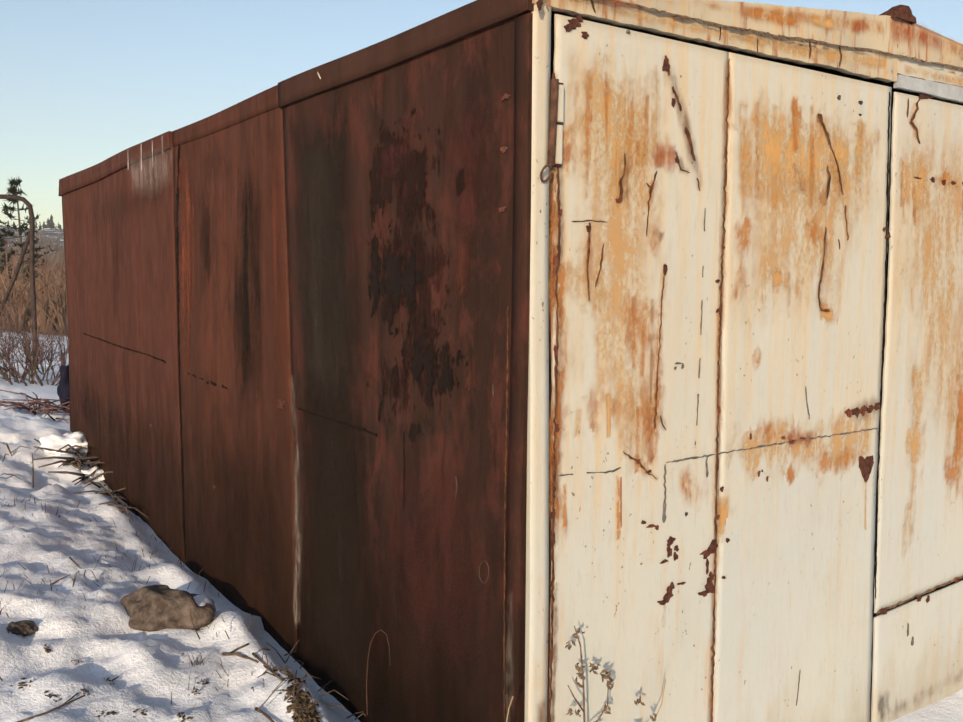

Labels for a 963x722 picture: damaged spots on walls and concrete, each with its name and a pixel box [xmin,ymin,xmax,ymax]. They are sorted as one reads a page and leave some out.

rust [744,9,833,29]
rust [894,23,938,44]
rust [179,163,192,362]
rust [549,202,565,329]
rust [578,69,674,472]
rust [738,218,750,250]
rust [741,99,864,291]
rust [902,160,963,481]
rust [549,369,567,526]
rust [743,415,874,483]